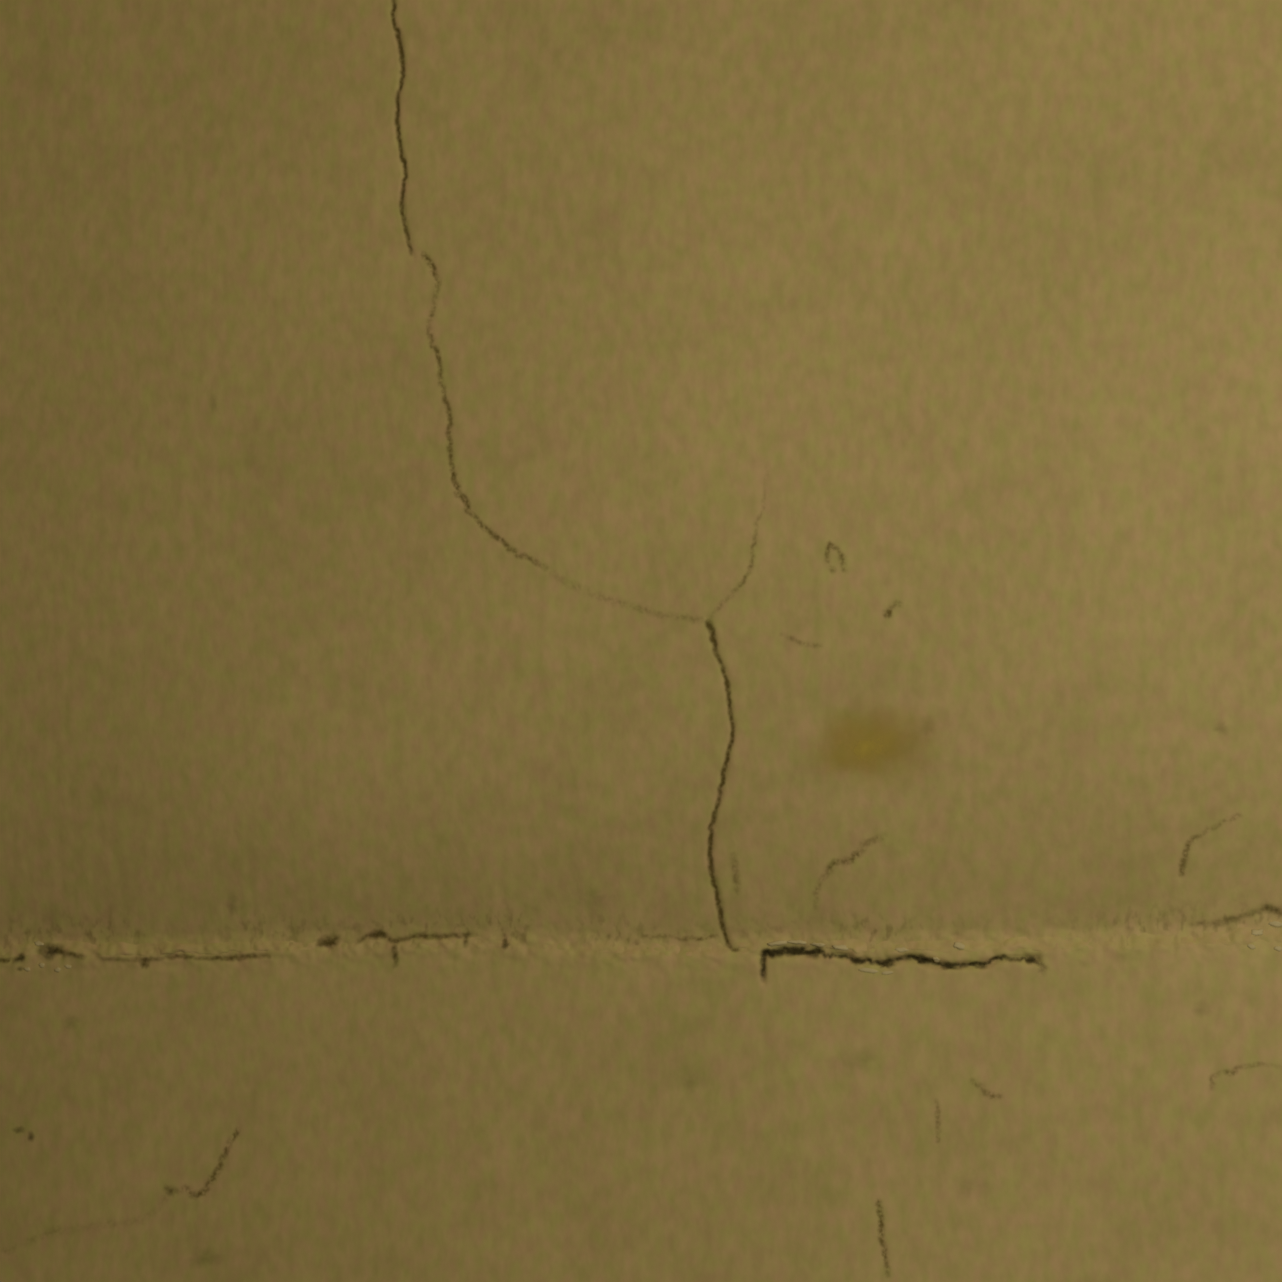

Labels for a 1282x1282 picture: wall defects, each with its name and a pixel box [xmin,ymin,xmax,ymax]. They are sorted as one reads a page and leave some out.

crack [392,3,435,275]
crack [700,622,734,944]